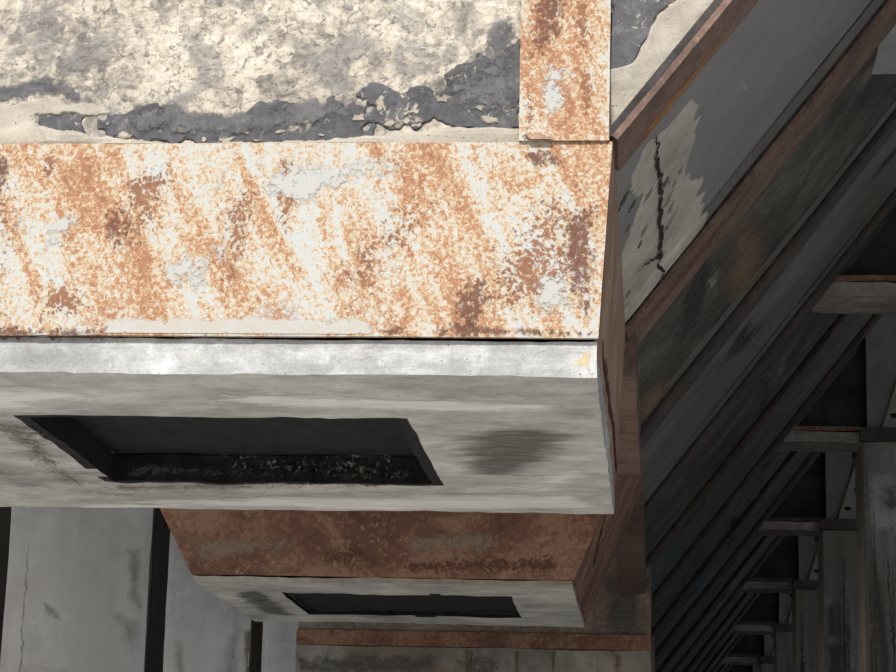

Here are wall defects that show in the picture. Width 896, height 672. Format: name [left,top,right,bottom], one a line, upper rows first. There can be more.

peeling [0,39,553,144]
corrosion [524,94,561,167]
corrosion [525,0,589,60]
peeling [610,0,714,125]
corrosion [0,279,104,342]
corrosion [103,164,174,252]
corrosion [215,186,260,292]
corrosion [336,191,438,311]
corrosion [436,184,599,341]
crack [637,137,678,285]
peeling [618,99,708,322]
crack [19,546,29,672]